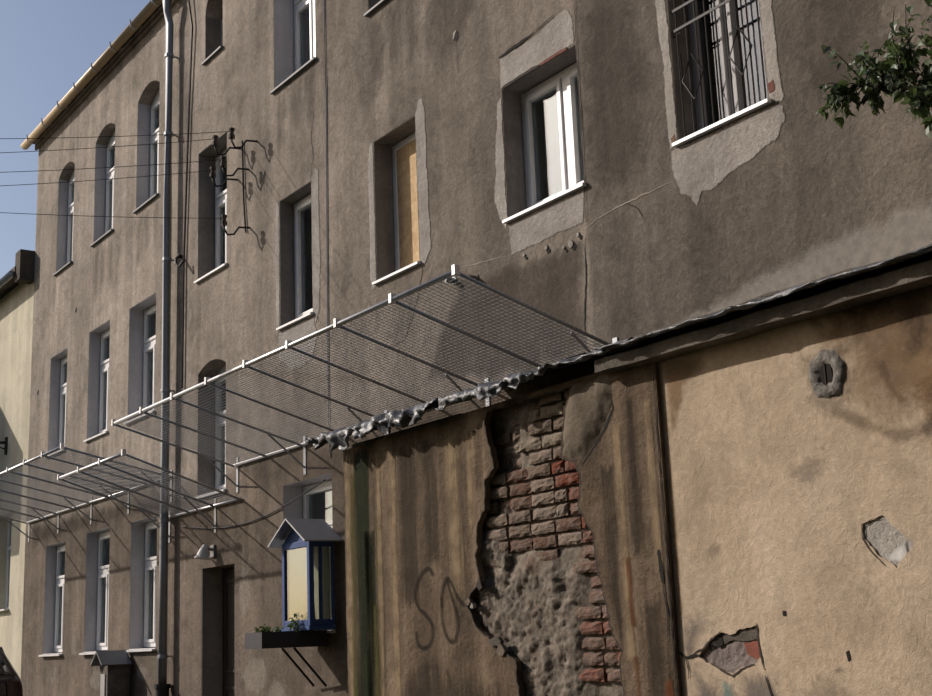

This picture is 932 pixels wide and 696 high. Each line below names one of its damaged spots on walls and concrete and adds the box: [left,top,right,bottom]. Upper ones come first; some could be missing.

crack [581,249,589,329]
spalling [465,389,625,696]
flaking render [861,516,913,567]
flaking render [693,624,765,677]